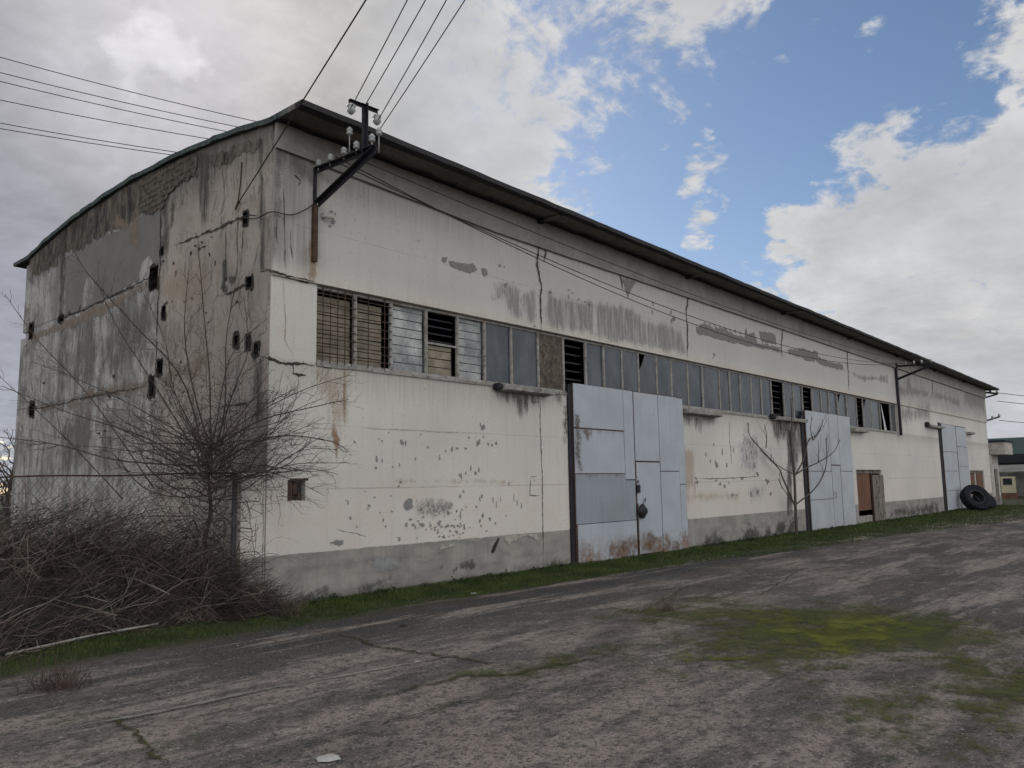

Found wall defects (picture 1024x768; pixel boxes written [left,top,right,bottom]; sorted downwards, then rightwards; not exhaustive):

spalling [212,139,261,169]
spalling [59,155,197,254]
damp [27,201,149,471]
spalling [148,247,176,292]
crack [30,175,314,410]
peeling [442,257,488,277]
crack [536,247,546,334]
peeling [696,322,885,382]
peeling [365,466,538,553]
peeling [706,440,772,497]
damp [743,421,801,539]